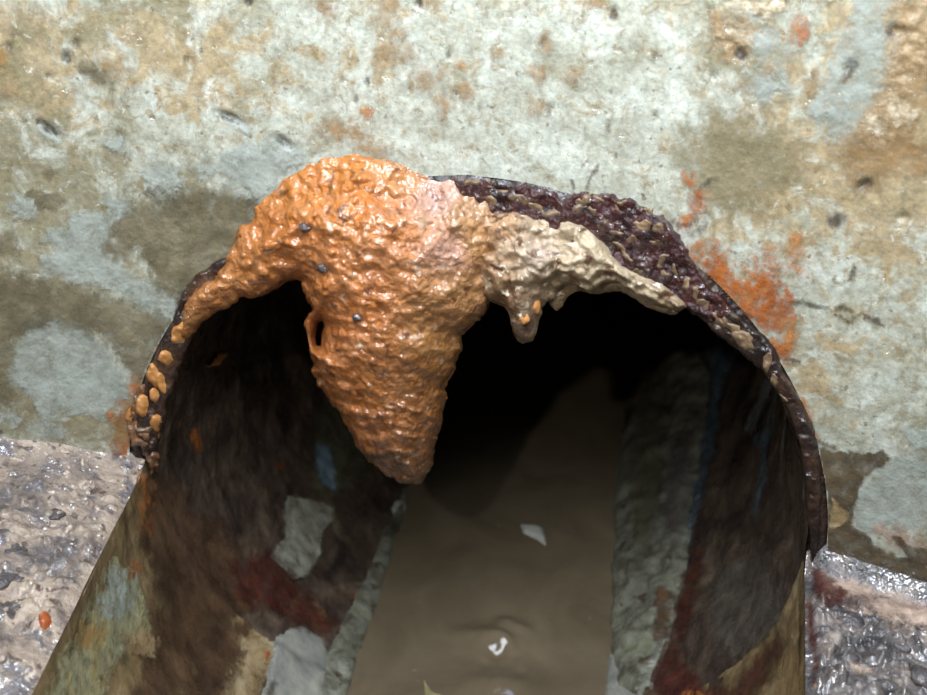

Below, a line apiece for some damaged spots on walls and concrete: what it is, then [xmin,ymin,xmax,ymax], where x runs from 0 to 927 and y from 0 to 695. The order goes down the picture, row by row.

water stain [0,272,171,419]
water stain [102,183,258,299]
corrosion [175,131,492,485]
corrosion [678,174,707,227]
corrosion [687,239,801,364]
crack [790,300,880,324]
corrosion [647,548,852,695]